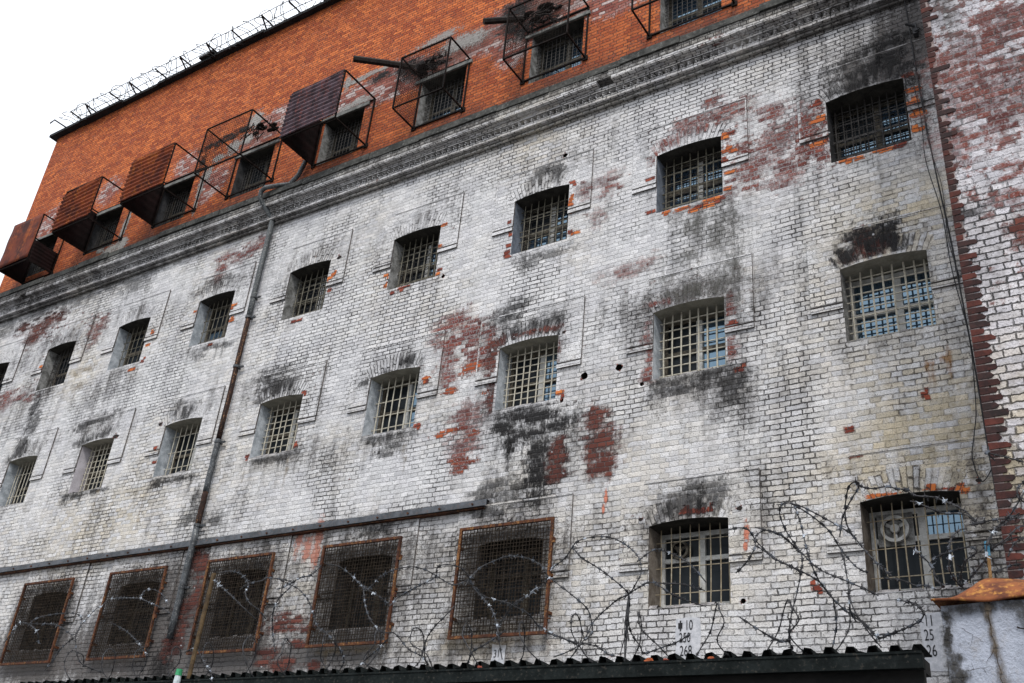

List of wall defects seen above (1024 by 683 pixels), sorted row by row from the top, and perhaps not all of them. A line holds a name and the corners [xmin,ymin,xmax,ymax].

peeling [214,235,270,282]
flaking render [645,0,1024,580]
peeling [640,321,652,383]
peeling [413,302,566,475]
water stain [649,363,747,406]
peeling [544,400,624,513]
water stain [463,469,547,518]